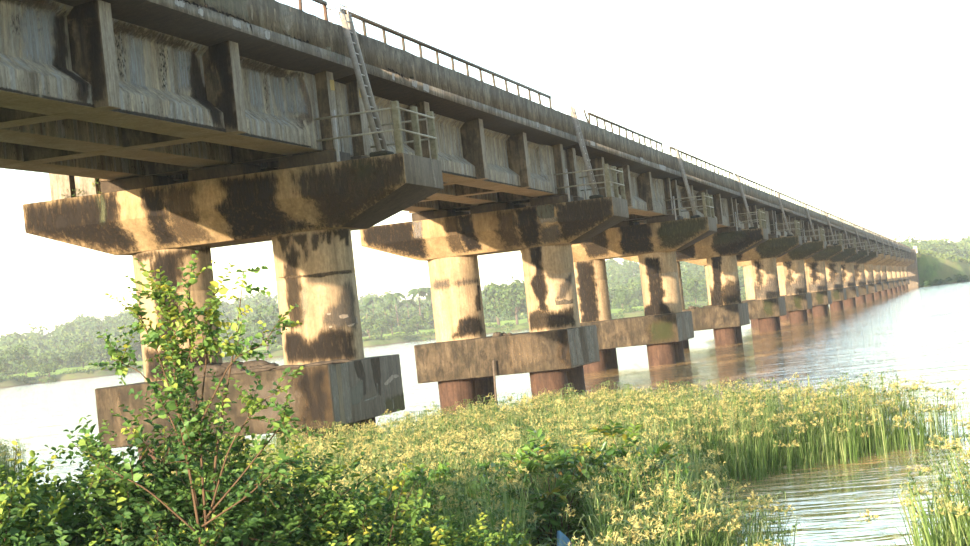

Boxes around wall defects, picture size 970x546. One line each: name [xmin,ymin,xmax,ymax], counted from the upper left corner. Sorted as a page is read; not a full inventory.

water stain [0,0,106,107]
water stain [111,20,311,148]
water stain [214,154,405,428]
water stain [363,221,428,258]
water stain [431,159,691,369]